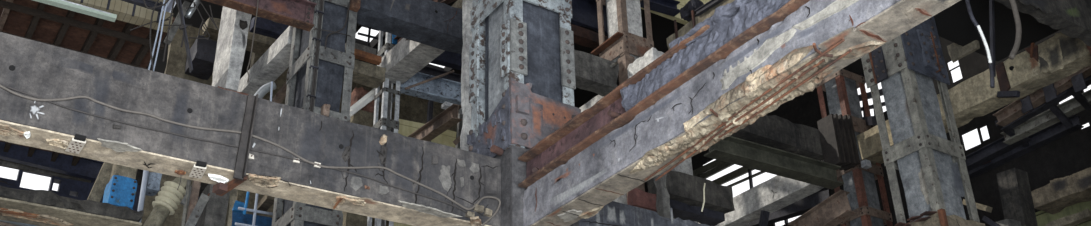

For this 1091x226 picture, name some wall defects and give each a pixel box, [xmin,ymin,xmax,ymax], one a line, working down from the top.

corrosion [526,91,581,140]
crack [610,72,715,146]
crack [535,174,644,226]